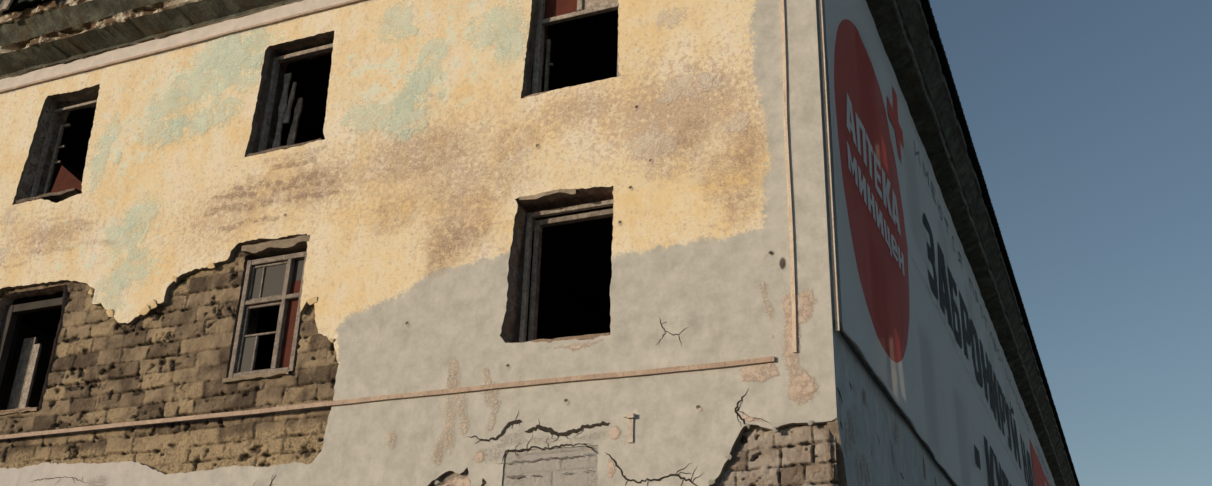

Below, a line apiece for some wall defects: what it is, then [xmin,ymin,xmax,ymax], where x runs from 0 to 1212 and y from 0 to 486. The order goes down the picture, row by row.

flaking render [0,241,339,474]
crack [657,319,689,345]
peeling [741,283,818,405]
crack [735,388,767,425]
flaking render [432,433,541,486]
crack [465,410,702,486]
flaking render [708,414,841,486]